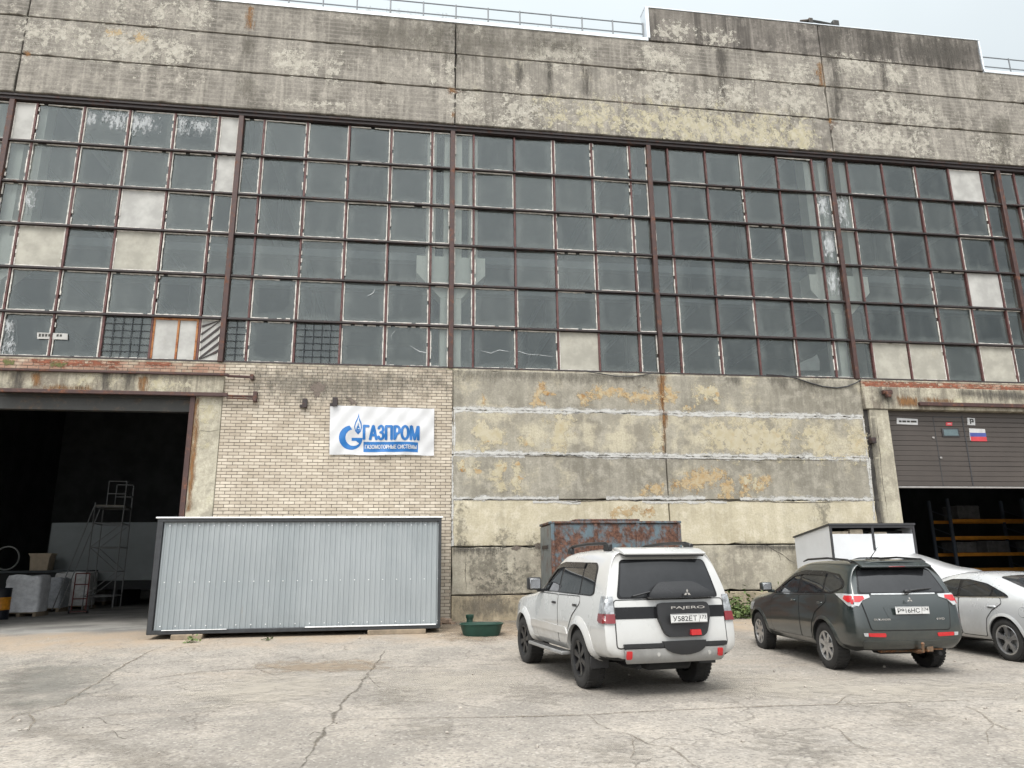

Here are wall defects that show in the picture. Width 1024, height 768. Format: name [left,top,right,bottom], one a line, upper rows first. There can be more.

rust [658,375,668,454]
peeling [457,381,869,519]